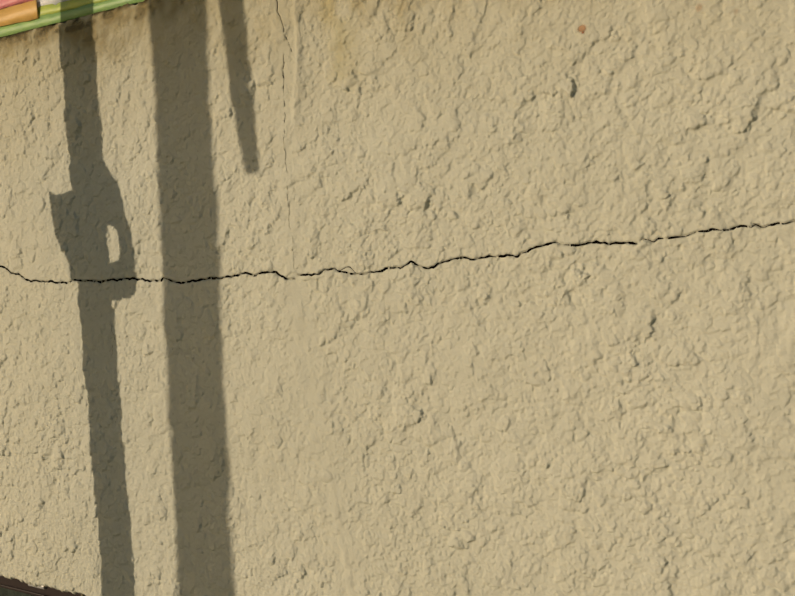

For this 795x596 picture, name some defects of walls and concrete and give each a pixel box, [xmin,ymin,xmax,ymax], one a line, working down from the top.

crack [0,195,793,284]